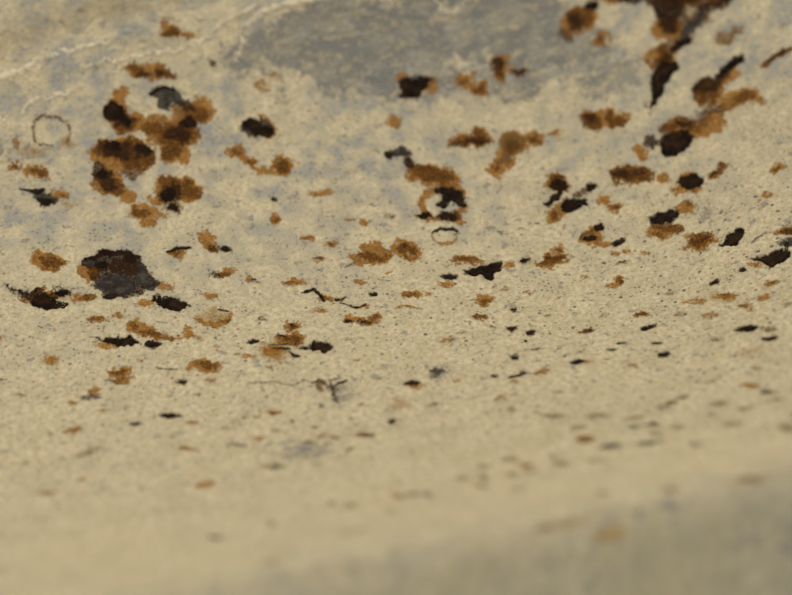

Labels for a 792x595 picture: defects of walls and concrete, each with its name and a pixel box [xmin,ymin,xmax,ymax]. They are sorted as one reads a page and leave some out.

peeling [78,0,641,106]
corrosion [555,0,719,71]
crack [679,0,732,41]
crack [645,61,680,109]
corrosion [87,85,217,228]
peeling [240,114,281,139]
corrosion [384,145,462,190]
corrosion [448,125,558,181]
corrosion [609,54,767,187]
peeling [6,248,191,312]
peeling [438,255,531,288]
peeling [740,237,792,272]